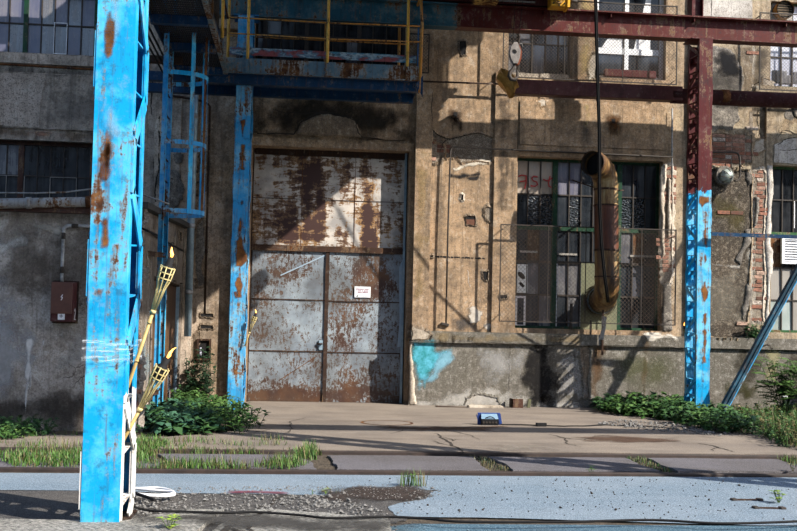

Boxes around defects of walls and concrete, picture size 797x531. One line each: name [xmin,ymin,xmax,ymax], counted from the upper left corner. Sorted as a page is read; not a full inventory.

rust [104,12,115,57]
rust [100,132,113,183]
flaking render [432,128,496,167]
rust [236,219,247,266]
flaking render [710,105,797,341]
rust [234,277,243,298]
flaking render [135,209,151,432]
water stain [417,388,547,407]
water stain [557,356,585,408]
crack [433,426,510,453]